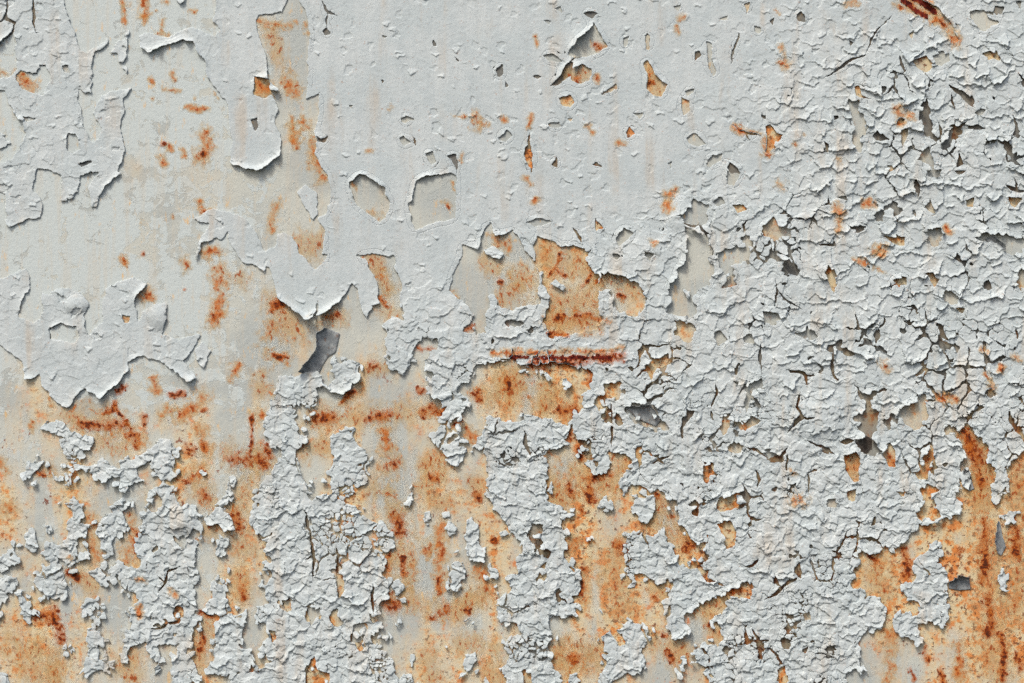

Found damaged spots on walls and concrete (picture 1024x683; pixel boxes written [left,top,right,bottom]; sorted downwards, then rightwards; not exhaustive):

peeling [844,0,1024,182]
crack [923,89,966,153]
peeling [1004,191,1024,211]
rust [48,375,274,565]
peeling [0,0,805,683]
rust [366,449,491,622]
rust [467,244,642,516]
crack [604,384,721,467]
crack [742,527,857,665]
crack [733,317,887,504]
peeling [785,199,1024,683]
rust [922,426,1024,683]